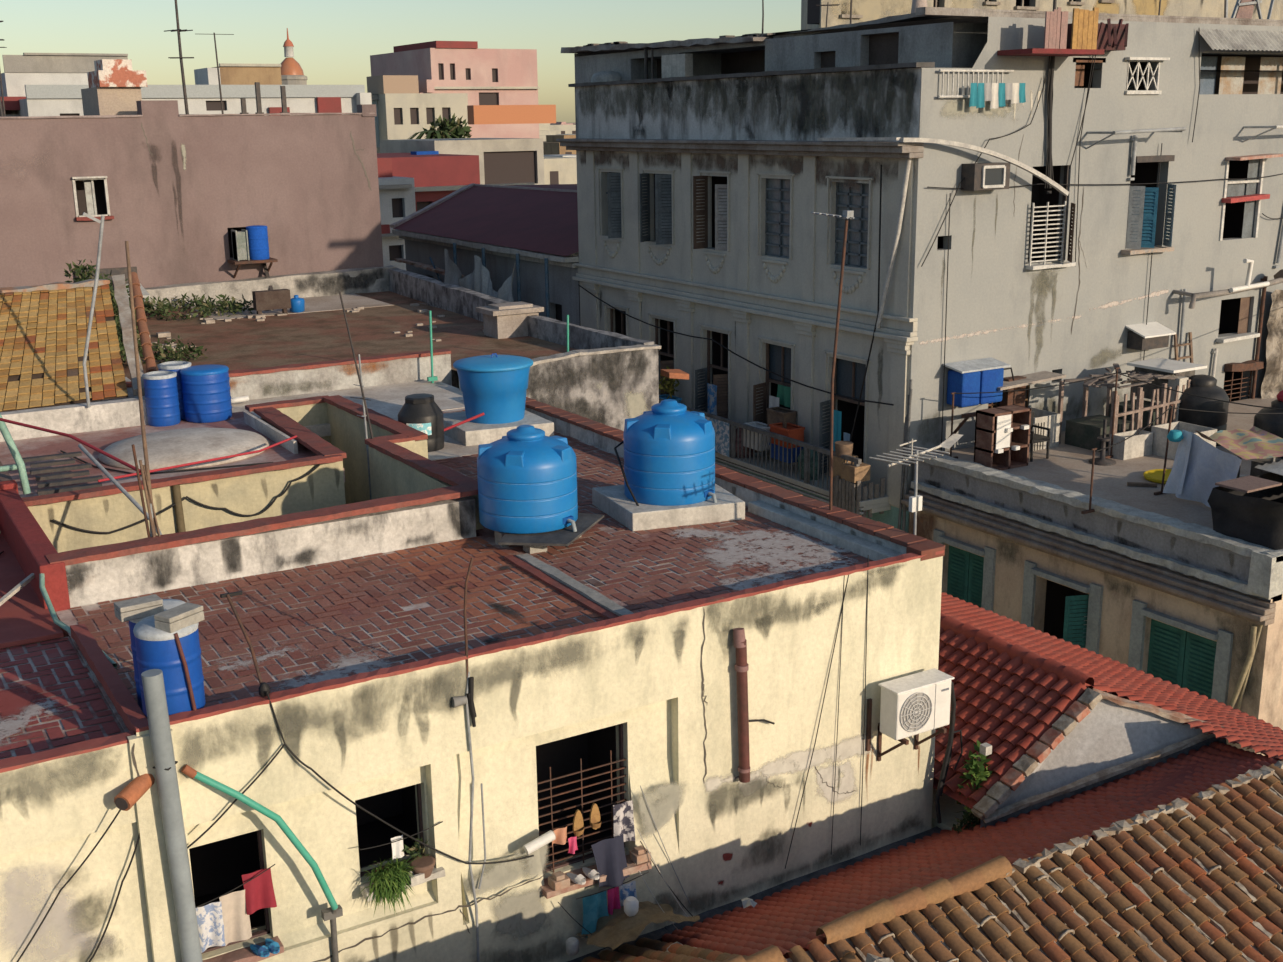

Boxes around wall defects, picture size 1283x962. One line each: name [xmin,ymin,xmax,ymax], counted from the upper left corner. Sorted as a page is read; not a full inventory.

flaking render [1095,0,1167,15]
water stain [579,68,917,138]
water stain [673,528,854,635]
water stain [850,568,896,593]
water stain [491,603,535,625]
water stain [219,648,296,671]
water stain [406,641,588,713]
water stain [631,629,643,648]
water stain [675,623,686,657]
water stain [0,684,56,740]
water stain [184,655,388,767]
water stain [0,752,107,800]